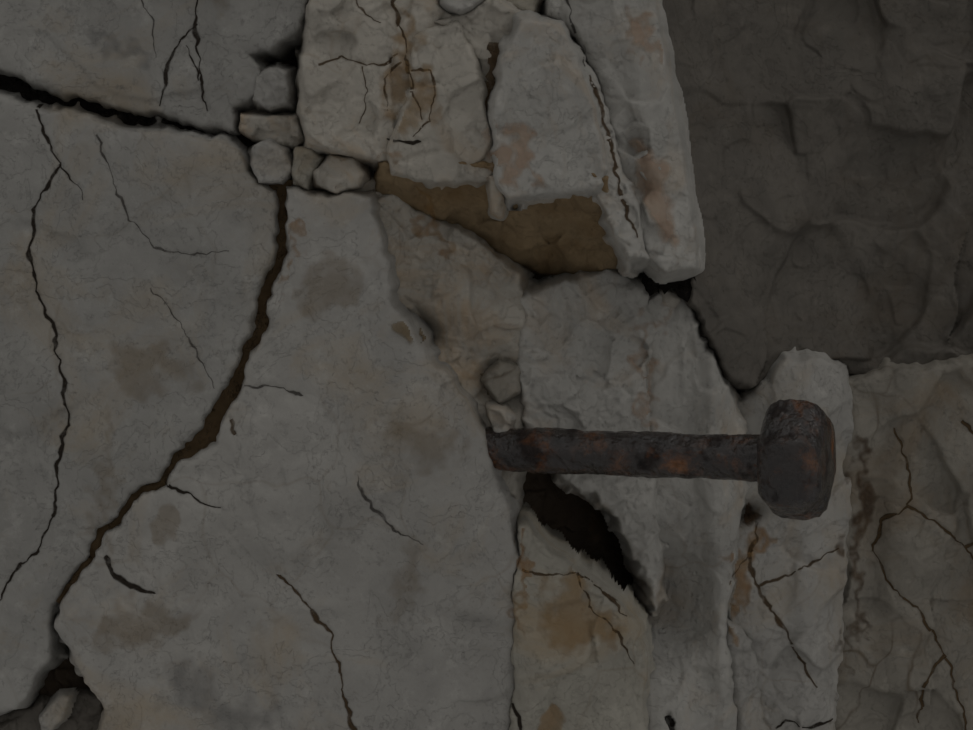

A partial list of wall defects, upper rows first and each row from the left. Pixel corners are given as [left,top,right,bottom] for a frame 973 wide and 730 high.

crack [0,0,256,600]
crack [56,179,303,604]
crack [357,481,423,545]
crack [276,574,357,730]
crack [665,715,676,730]
crack [729,525,838,688]
crack [776,718,833,729]